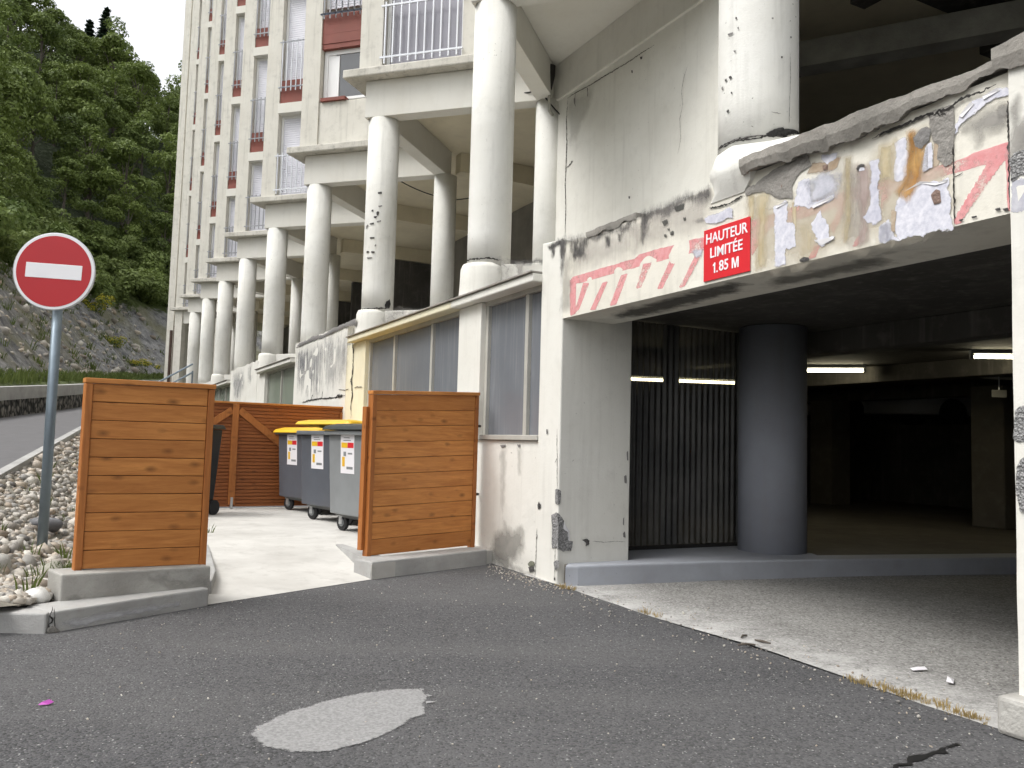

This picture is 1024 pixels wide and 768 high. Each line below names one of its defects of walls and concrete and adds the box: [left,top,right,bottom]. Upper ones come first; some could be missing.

leakage [501,188,710,275]
peeling [697,207,733,224]
spalling [745,152,840,267]
rust [899,132,925,198]
peeling [856,87,1009,244]
spalling [995,150,1024,212]
crack [302,307,388,410]
spalling [1013,406,1024,442]
spalling [1015,458,1024,512]
spalling [551,489,590,580]